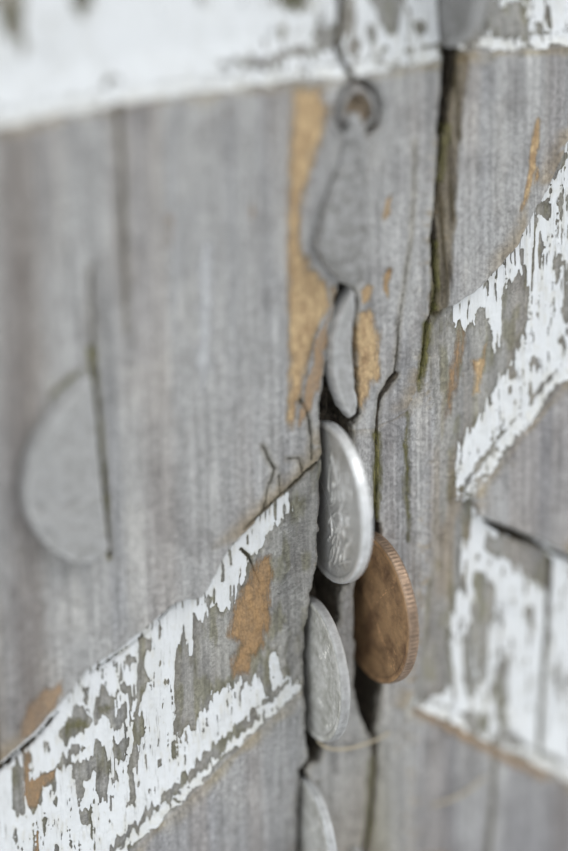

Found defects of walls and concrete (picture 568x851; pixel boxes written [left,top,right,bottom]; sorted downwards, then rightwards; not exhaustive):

peeling [458,0,568,51]
peeling [0,0,442,427]
crack [410,45,455,322]
peeling [521,118,539,210]
crack [245,271,406,533]
peeling [412,142,568,781]
crack [0,717,53,769]
peeling [0,492,302,851]
crack [298,727,322,779]
crack [309,565,348,624]
crack [353,656,380,851]